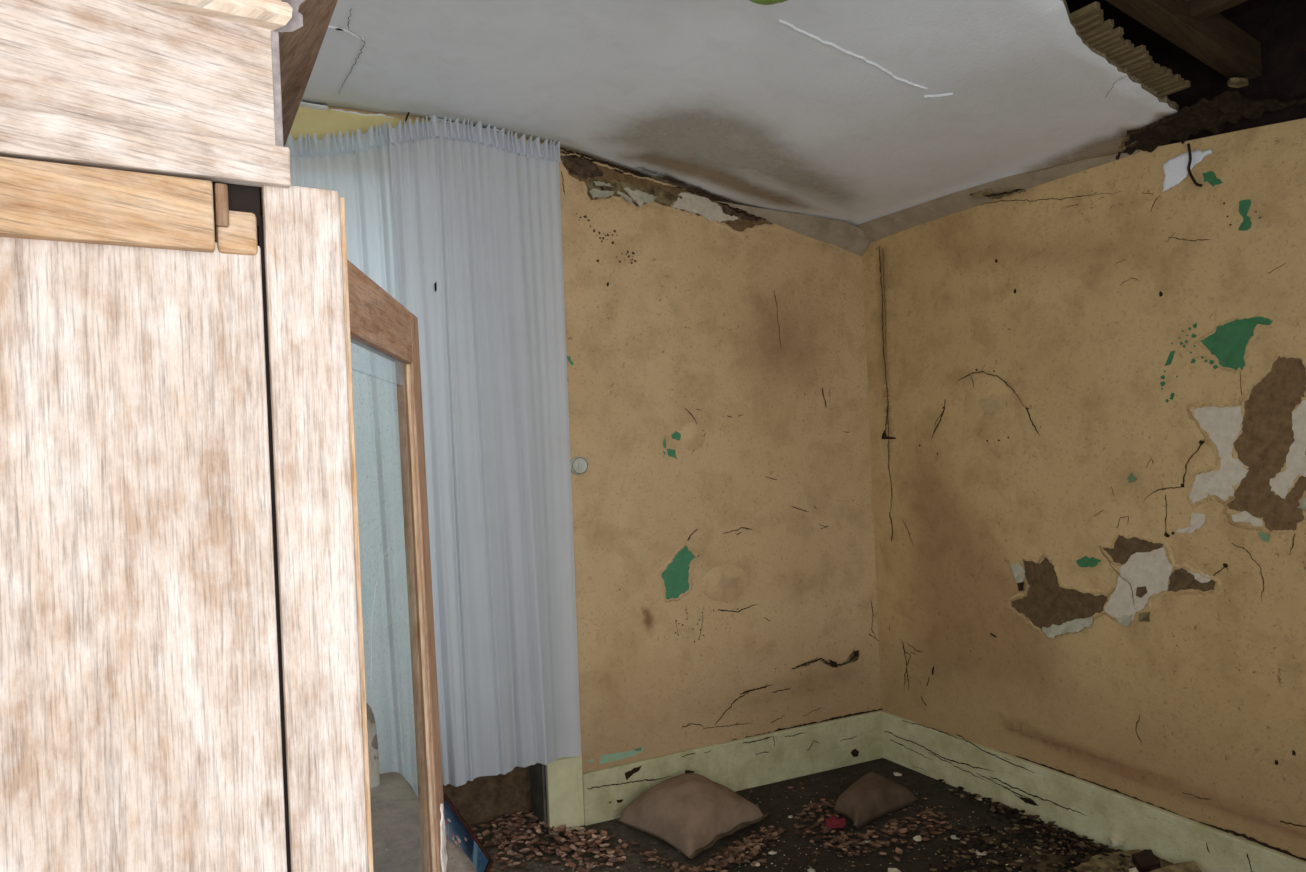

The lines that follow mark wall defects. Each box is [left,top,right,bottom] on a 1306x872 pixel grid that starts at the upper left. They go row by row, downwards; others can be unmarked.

crack [339,8,365,94]
flaking render [559,147,779,236]
water stain [560,152,794,204]
peeling [1161,149,1223,193]
peeling [1223,199,1261,231]
flaking render [1008,312,1306,638]
peeling [658,542,698,602]
crack [587,600,1087,816]